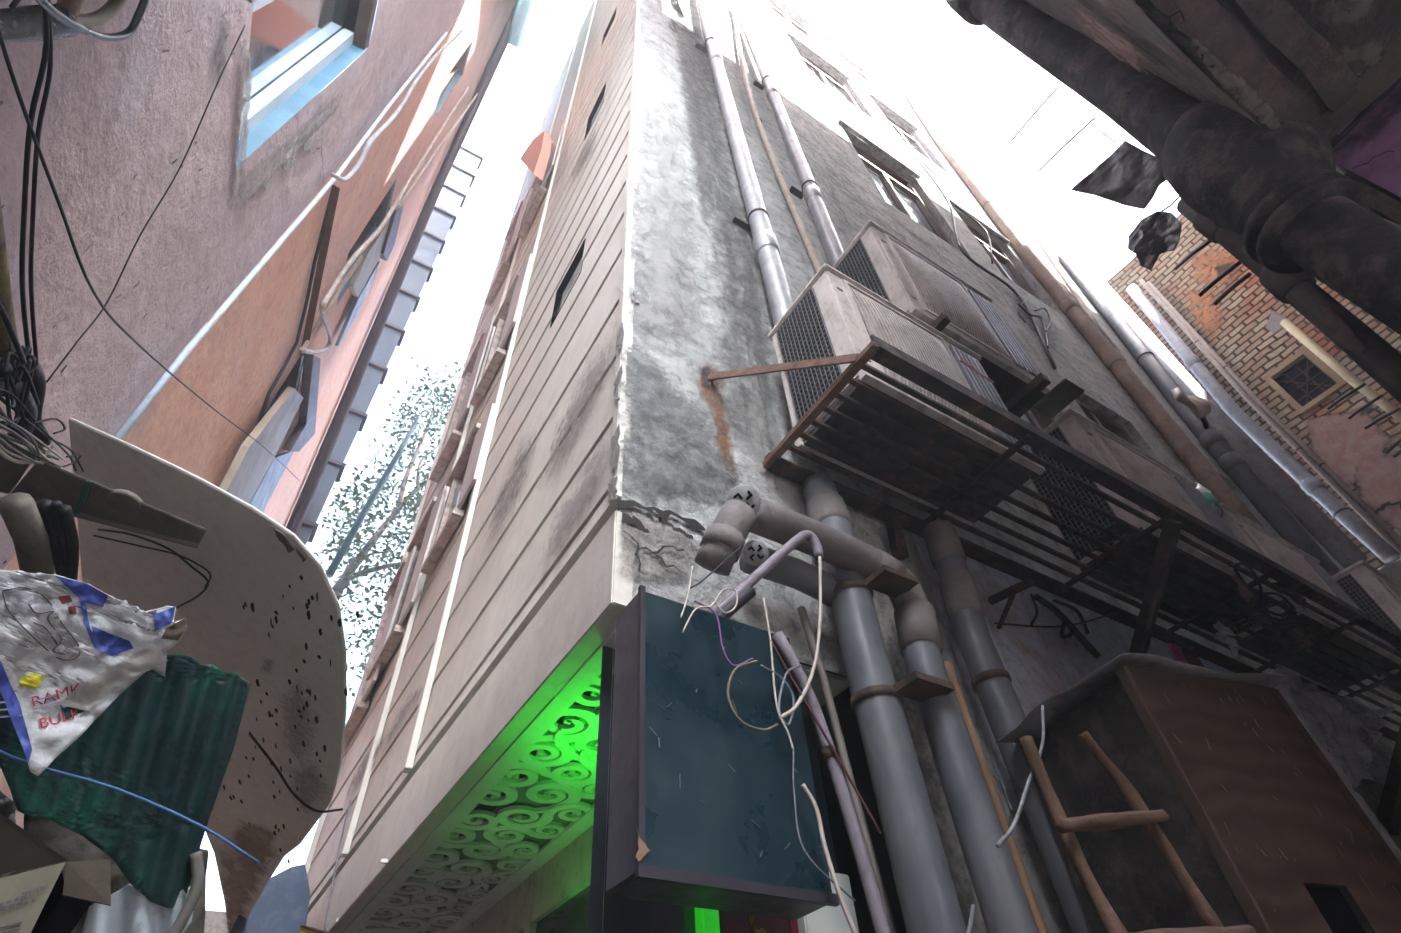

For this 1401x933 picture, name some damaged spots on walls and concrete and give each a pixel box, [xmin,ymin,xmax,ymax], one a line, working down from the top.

leakage [673,0,775,464]
crack [619,499,705,575]
corrosion [700,364,735,483]
peeling [1307,404,1401,547]